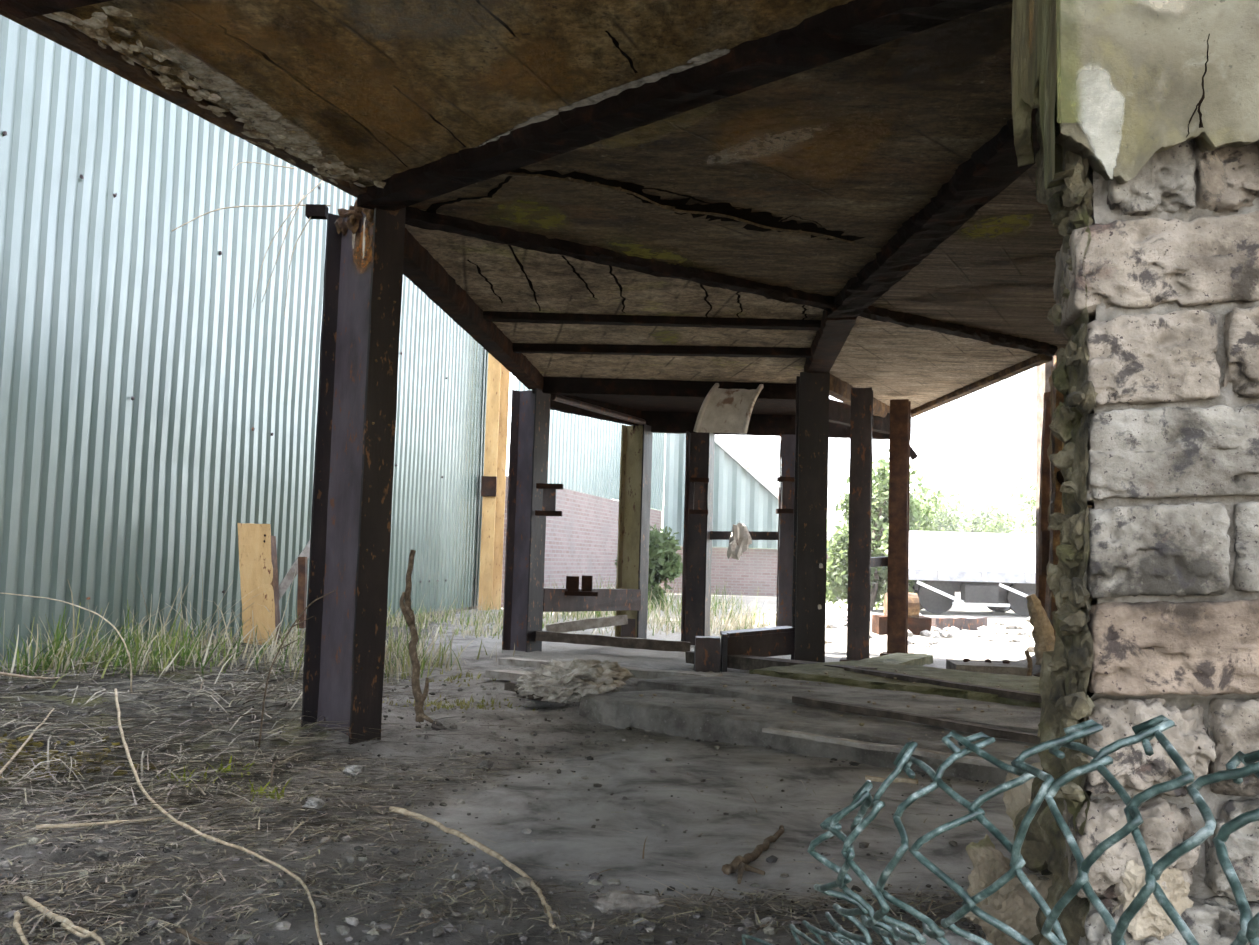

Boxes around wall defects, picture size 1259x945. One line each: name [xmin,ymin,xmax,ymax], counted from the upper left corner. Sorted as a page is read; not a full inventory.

crack [476,0,516,37]
crack [605,30,638,73]
crack [1186,33,1210,137]
peeling [1076,67,1124,179]
spalling [1200,154,1226,199]
crack [425,168,865,244]
crack [467,260,503,303]
crack [508,245,541,311]
crack [561,255,626,313]
crack [700,284,743,318]